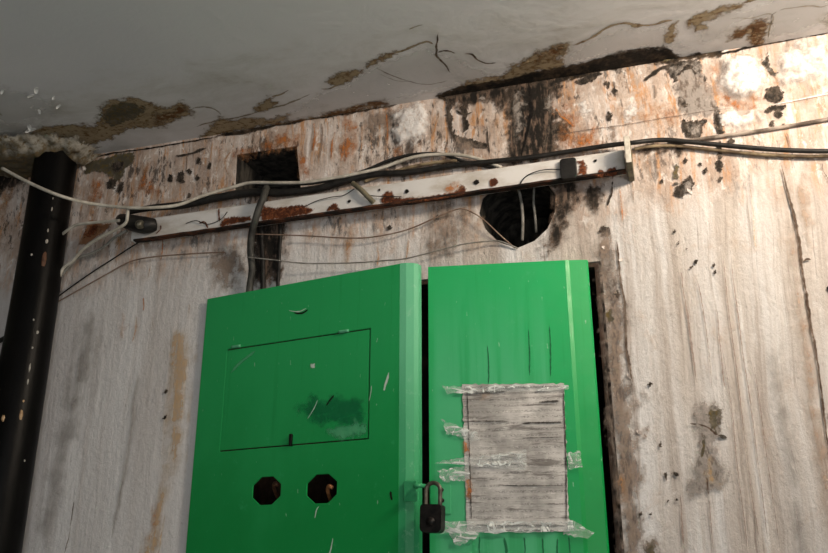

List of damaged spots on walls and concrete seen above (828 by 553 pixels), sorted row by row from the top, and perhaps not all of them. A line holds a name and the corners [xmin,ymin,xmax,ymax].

damp [25,90,290,148]
peeling [447,87,511,112]
damp [459,0,754,168]
crack [435,33,828,153]
damp [732,12,776,46]
corrosion [218,205,313,227]
crack [782,133,828,444]
damp [717,259,779,544]